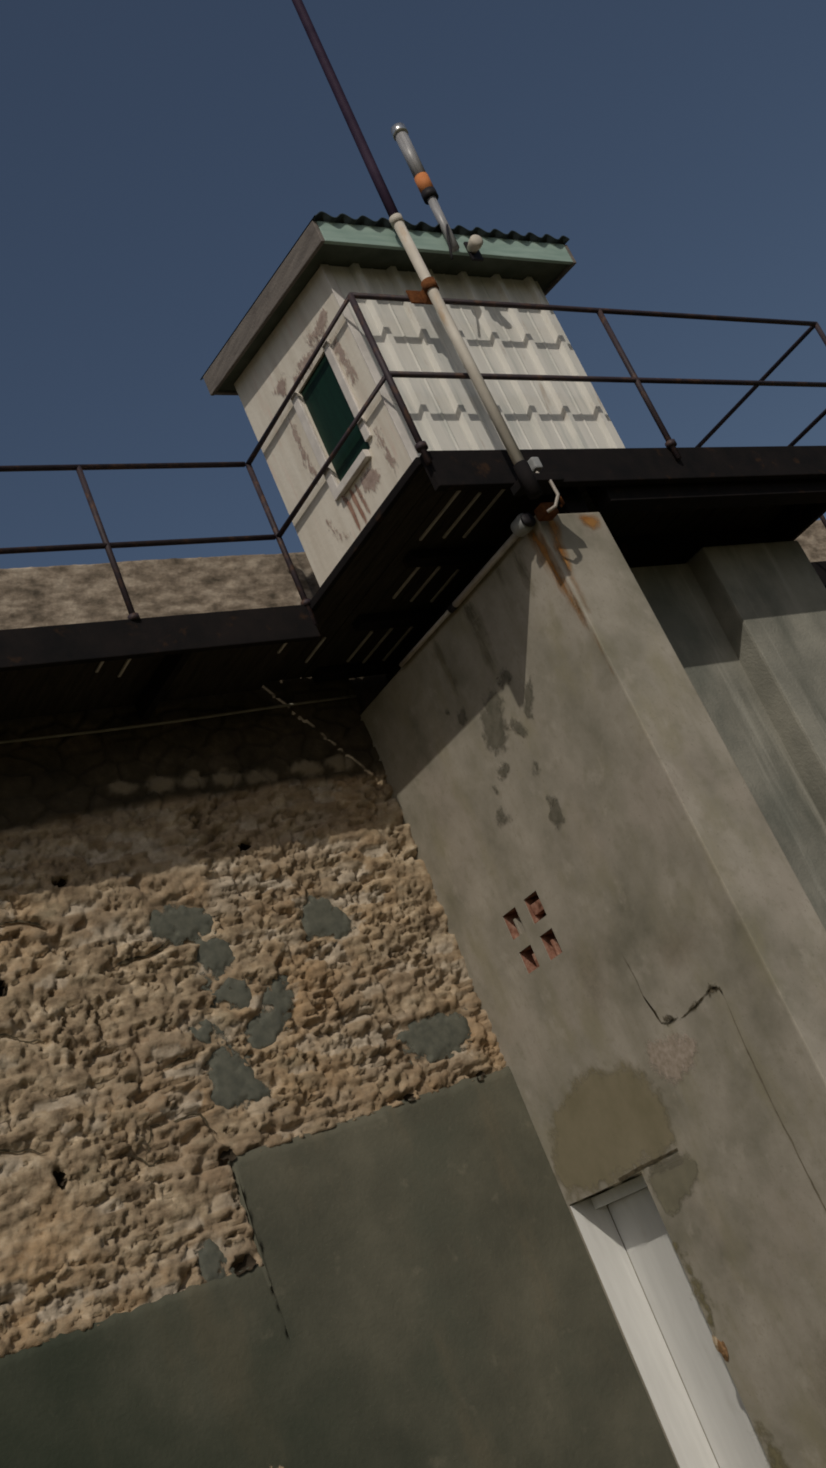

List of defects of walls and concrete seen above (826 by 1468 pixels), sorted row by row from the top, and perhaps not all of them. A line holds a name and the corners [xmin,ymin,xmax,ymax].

rust [341,485,370,530]
rust [531,520,581,616]
crack [618,956,826,1211]